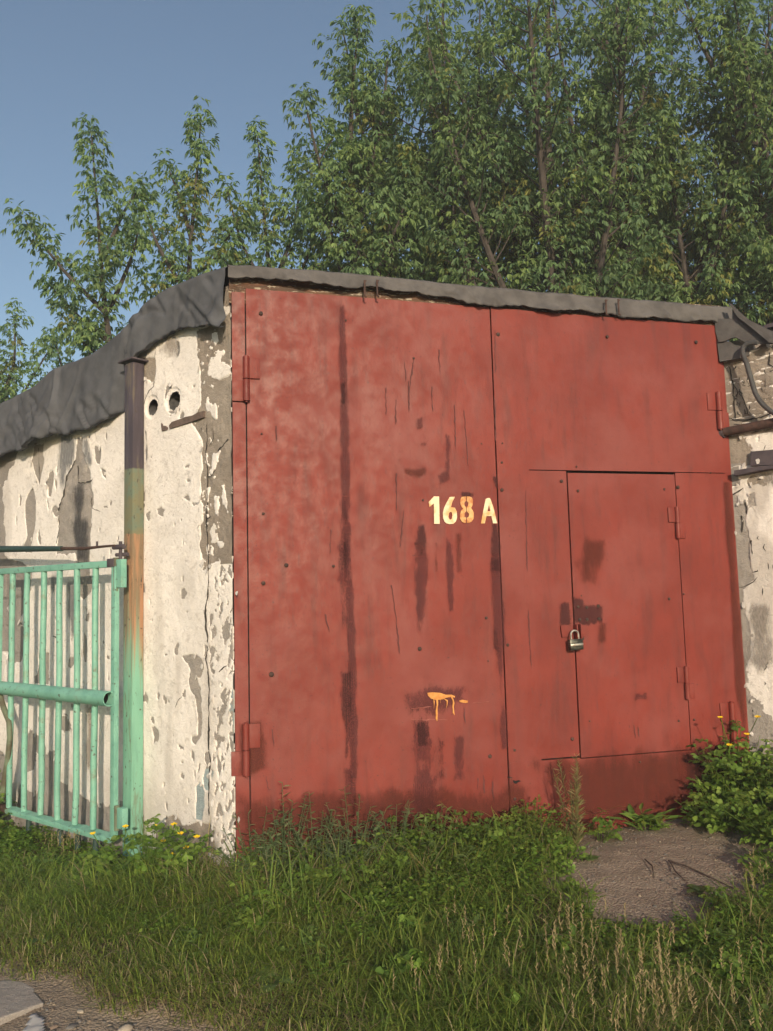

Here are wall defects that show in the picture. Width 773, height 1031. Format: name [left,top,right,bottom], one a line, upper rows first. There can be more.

spalling [34,652,50,684]
spalling [0,432,112,668]
spalling [0,717,124,859]
spalling [62,704,73,733]
peeling [143,309,240,858]
crack [204,425,229,814]
corrosion [243,310,523,845]
corrosion [560,598,605,641]
peeling [724,344,773,774]